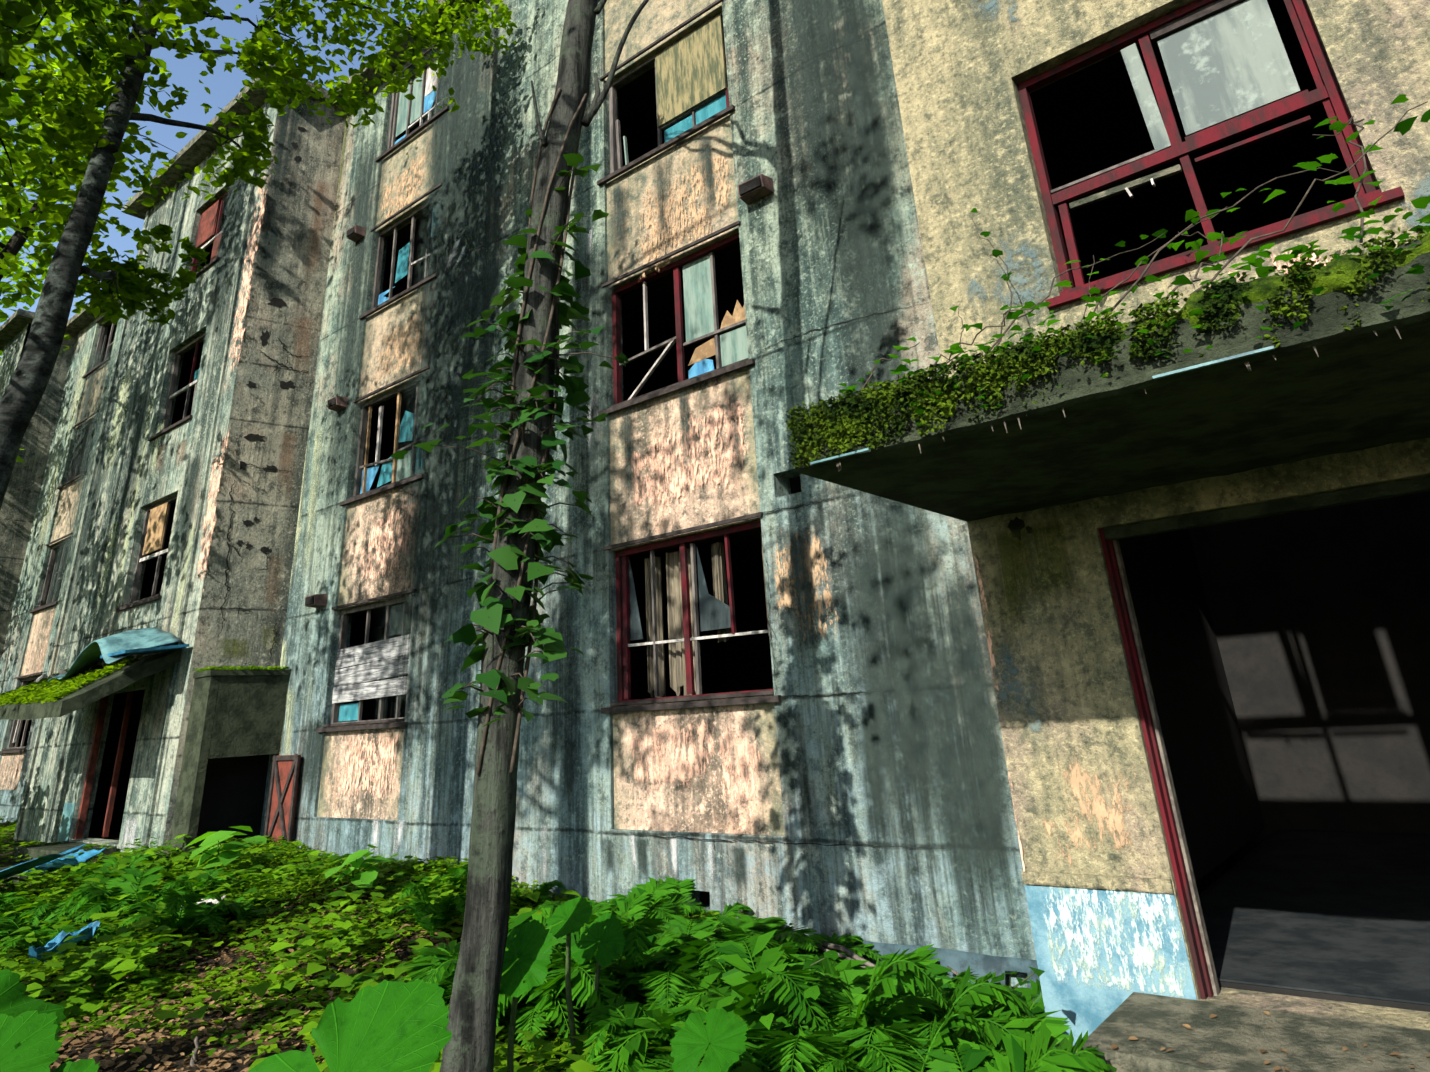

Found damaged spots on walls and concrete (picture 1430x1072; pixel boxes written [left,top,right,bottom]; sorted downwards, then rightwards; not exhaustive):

leakage [211,177,242,322]
leakage [790,0,904,392]
leakage [295,117,381,551]
leakage [42,351,162,601]
leakage [174,459,199,620]
leakage [679,393,689,449]
leakage [729,391,738,461]
leakage [790,534,815,642]
leakage [286,693,323,788]
leakage [777,710,809,813]
leakage [846,494,1041,879]
peeling [1044,887,1184,996]